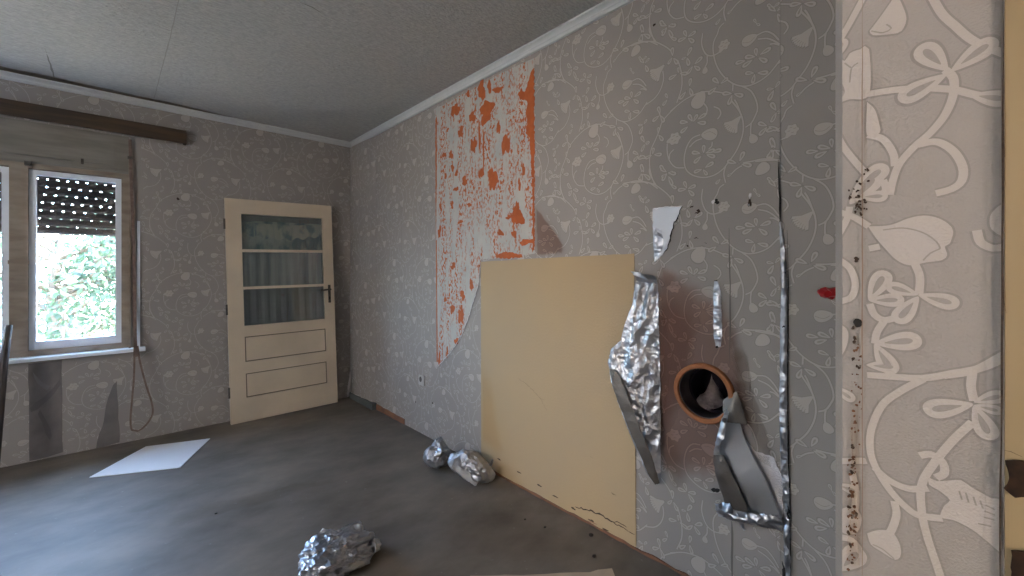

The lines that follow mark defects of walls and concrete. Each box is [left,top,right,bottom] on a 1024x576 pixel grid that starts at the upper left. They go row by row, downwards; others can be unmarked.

peeling [435,58,636,547]
damp [848,168,870,218]